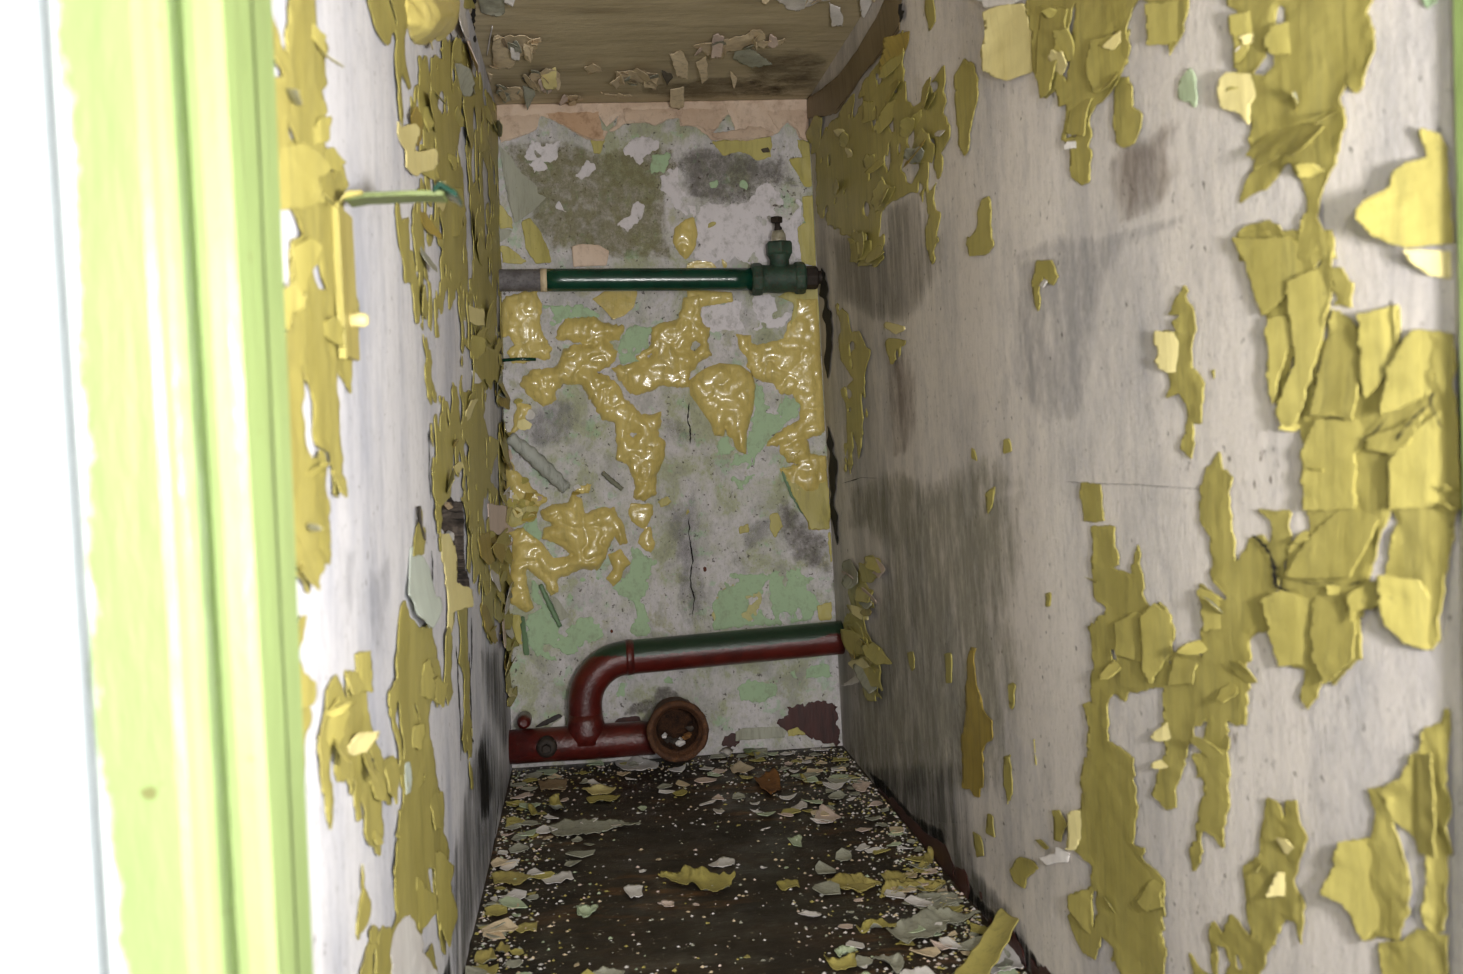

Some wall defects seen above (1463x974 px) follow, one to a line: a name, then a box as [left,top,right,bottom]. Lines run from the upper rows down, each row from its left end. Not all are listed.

peeling [272,0,360,594]
leakage [516,144,793,256]
crack [685,405,693,443]
crack [687,520,695,616]
peeling [298,0,1190,974]
peeling [1009,0,1463,974]